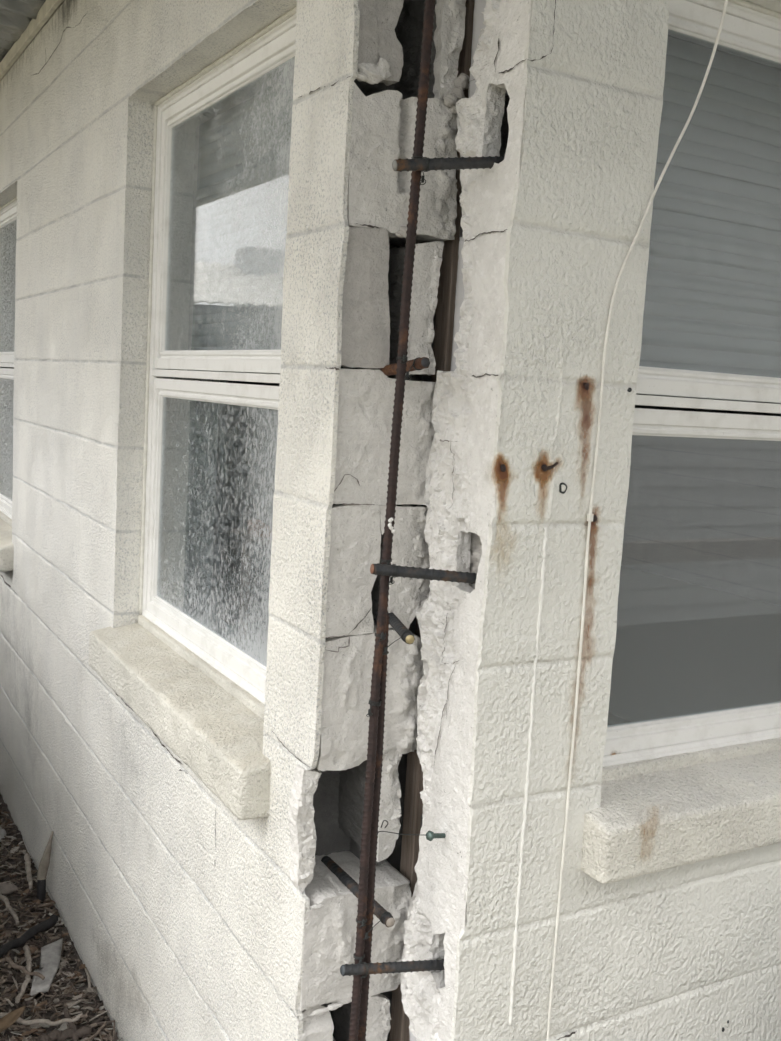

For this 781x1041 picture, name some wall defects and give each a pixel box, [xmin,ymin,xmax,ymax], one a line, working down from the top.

rust [578,378,593,478]
crack [334,474,374,506]
spalling [288,0,532,1041]
rust [494,455,510,508]
rust [535,453,559,497]
rust [587,509,598,594]
crack [327,609,371,652]
crack [434,613,459,763]